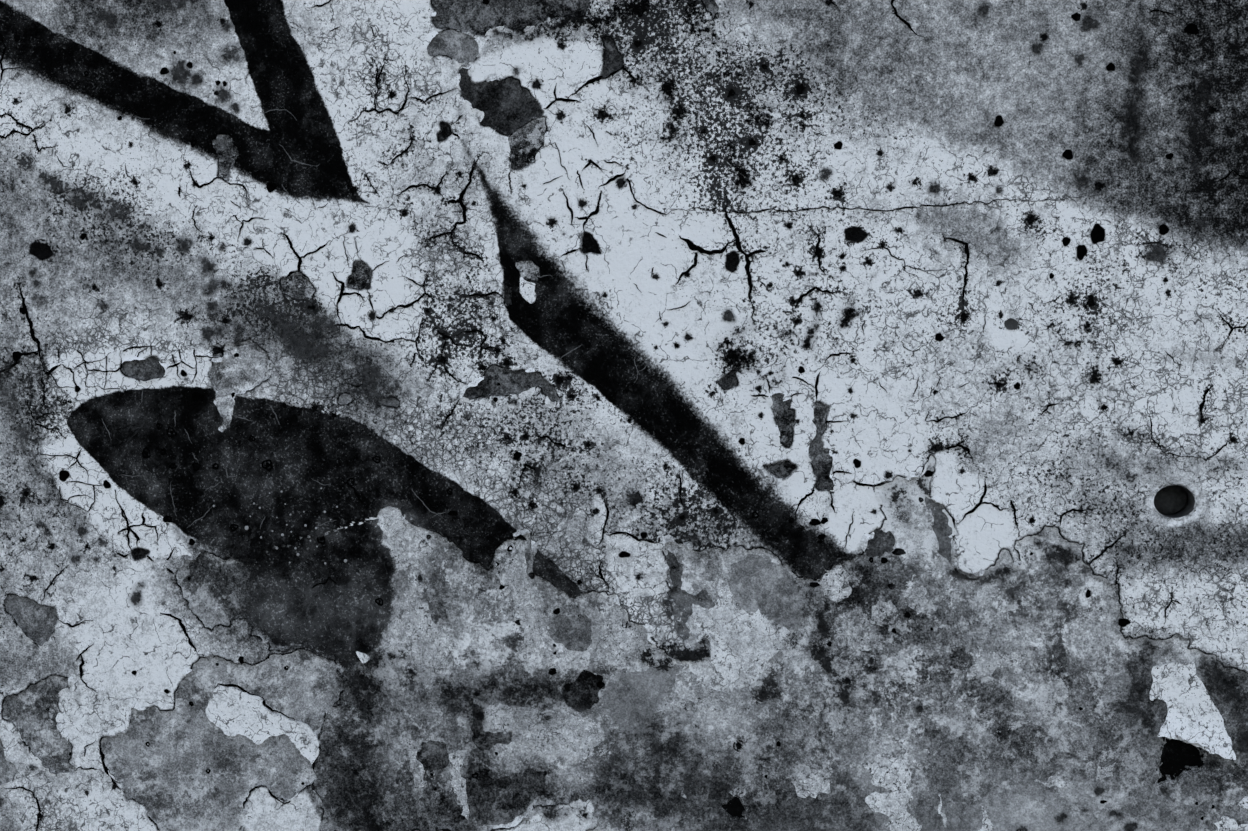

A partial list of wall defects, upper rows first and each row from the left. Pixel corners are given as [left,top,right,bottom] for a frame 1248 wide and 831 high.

crack [0,33,22,82]
peeling [422,0,589,169]
crack [891,0,928,42]
crack [0,113,69,168]
crack [178,26,494,424]
crack [539,66,1080,333]
crack [464,291,505,305]
crack [751,321,865,423]
peeling [1,595,58,652]
peeling [101,443,1248,831]
peeling [0,676,75,789]